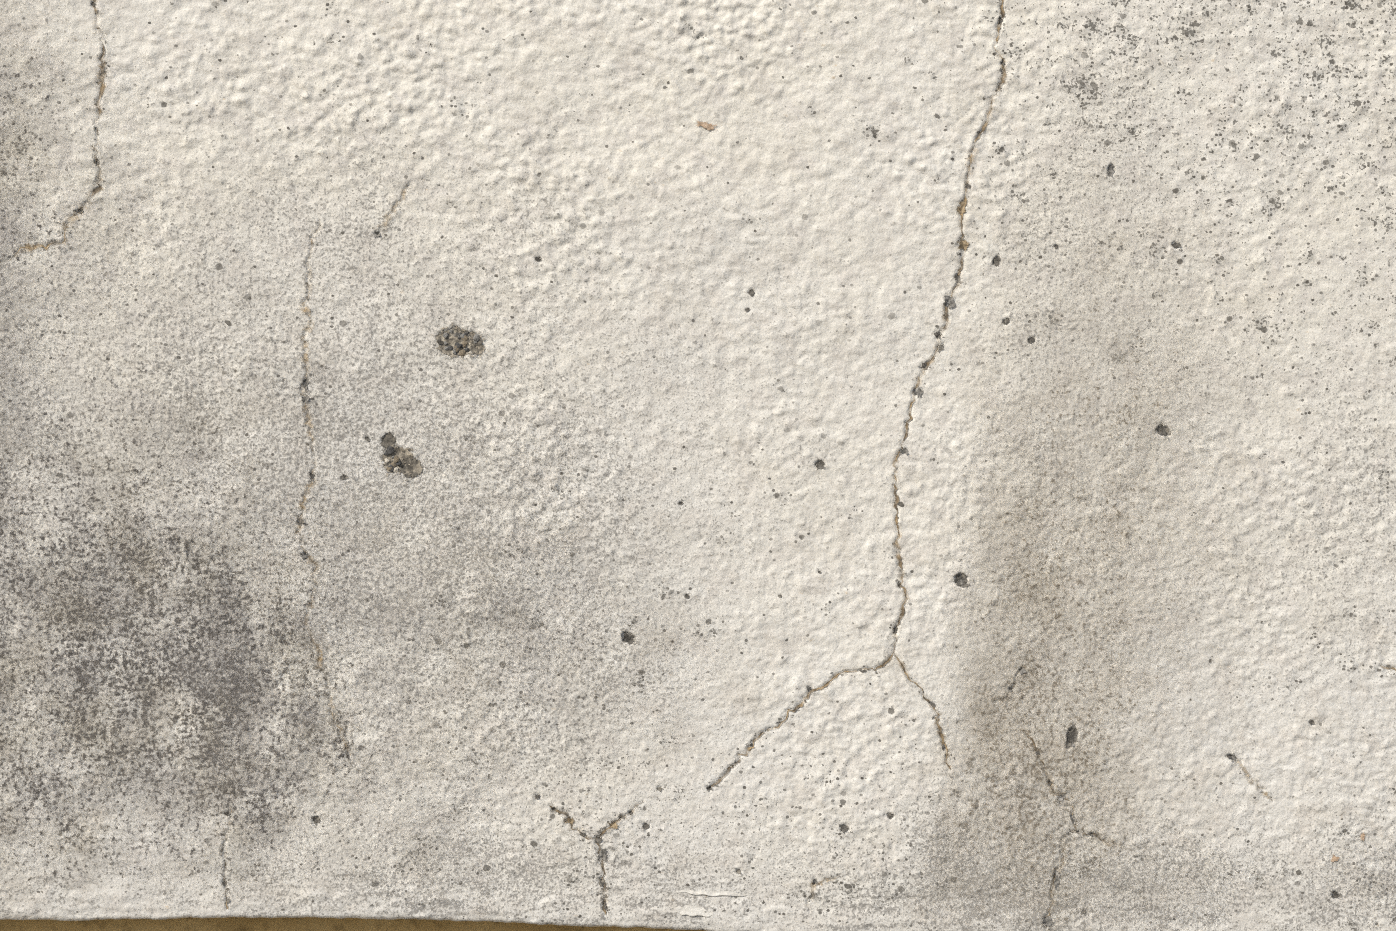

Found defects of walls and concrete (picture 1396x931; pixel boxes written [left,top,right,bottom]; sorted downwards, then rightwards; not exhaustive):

damp [0,33,80,280]
crack [14,0,105,257]
damp [0,293,397,899]
crack [534,786,664,915]
crack [707,0,1006,791]
damp [940,268,1178,924]